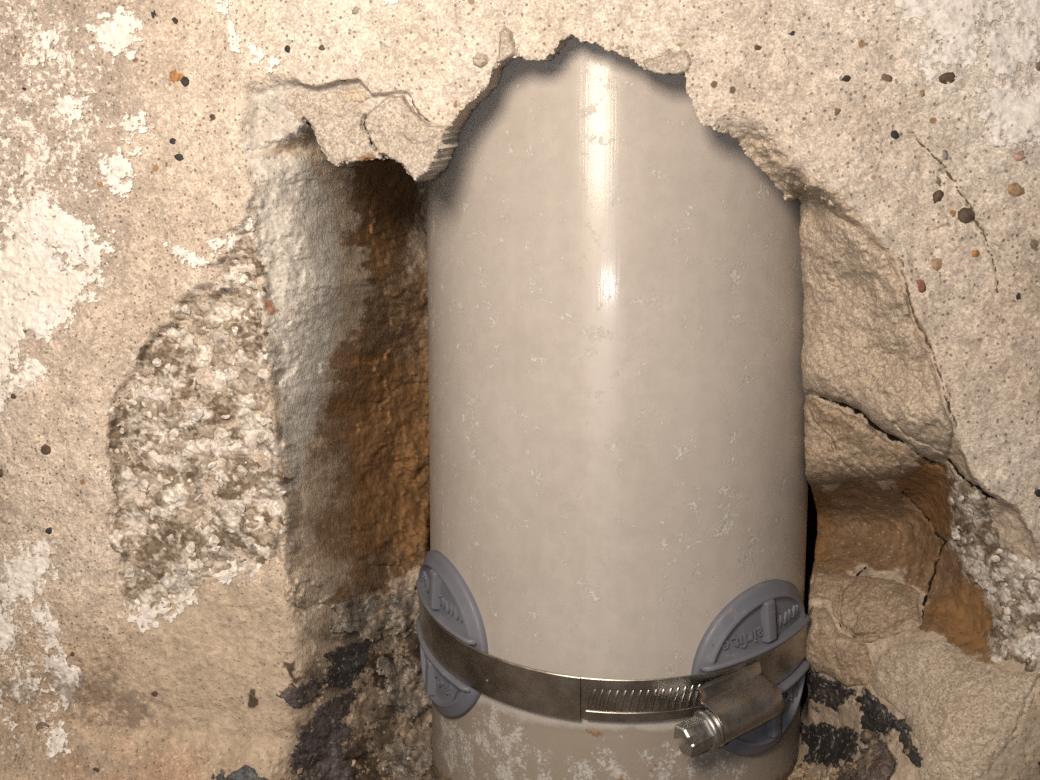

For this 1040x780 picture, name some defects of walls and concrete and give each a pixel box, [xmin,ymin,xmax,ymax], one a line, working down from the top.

spalling [284,85,465,182]
spalling [643,50,692,75]
leakage [872,0,1040,152]
leakage [0,0,155,423]
crack [915,139,999,293]
spalling [106,221,301,610]
crack [818,259,996,500]
leakage [0,534,84,758]
leakage [276,630,394,780]
leakage [800,670,923,768]
crack [901,491,947,618]
spalling [947,470,1040,672]